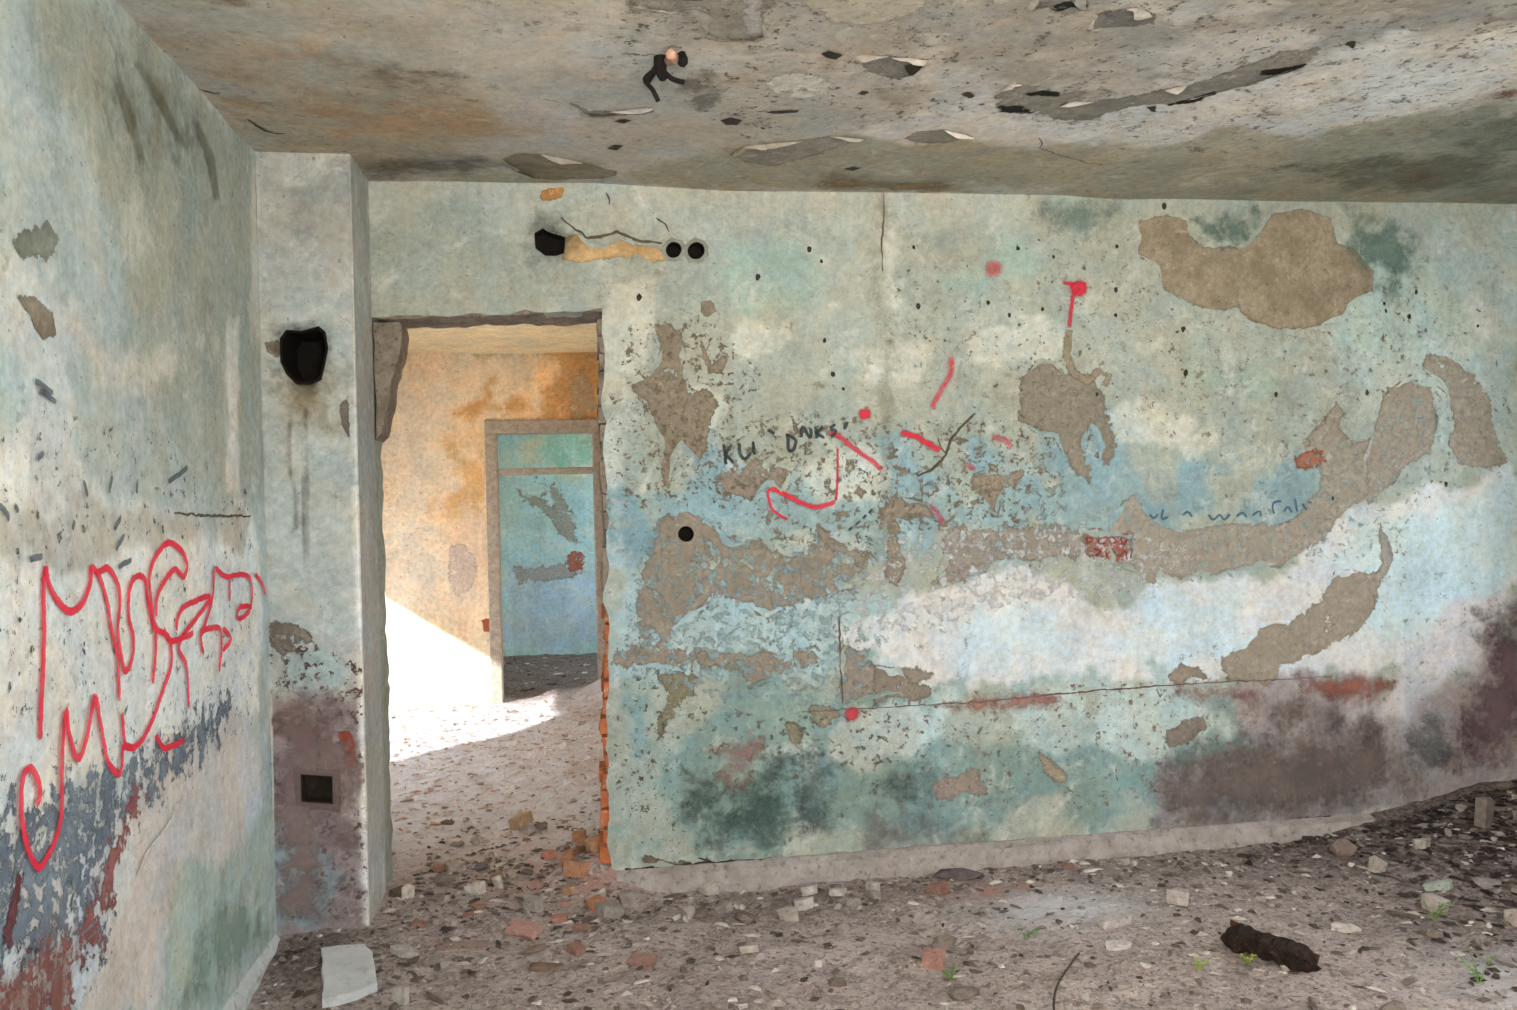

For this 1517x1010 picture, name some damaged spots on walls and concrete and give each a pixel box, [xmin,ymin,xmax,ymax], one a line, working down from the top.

spalling [599,0,1517,166]
peeling [13,220,59,262]
peeling [18,295,56,340]
spalling [609,203,1517,867]
water stain [1152,603,1517,826]
water stain [271,699,365,918]
water stain [186,905,260,1002]